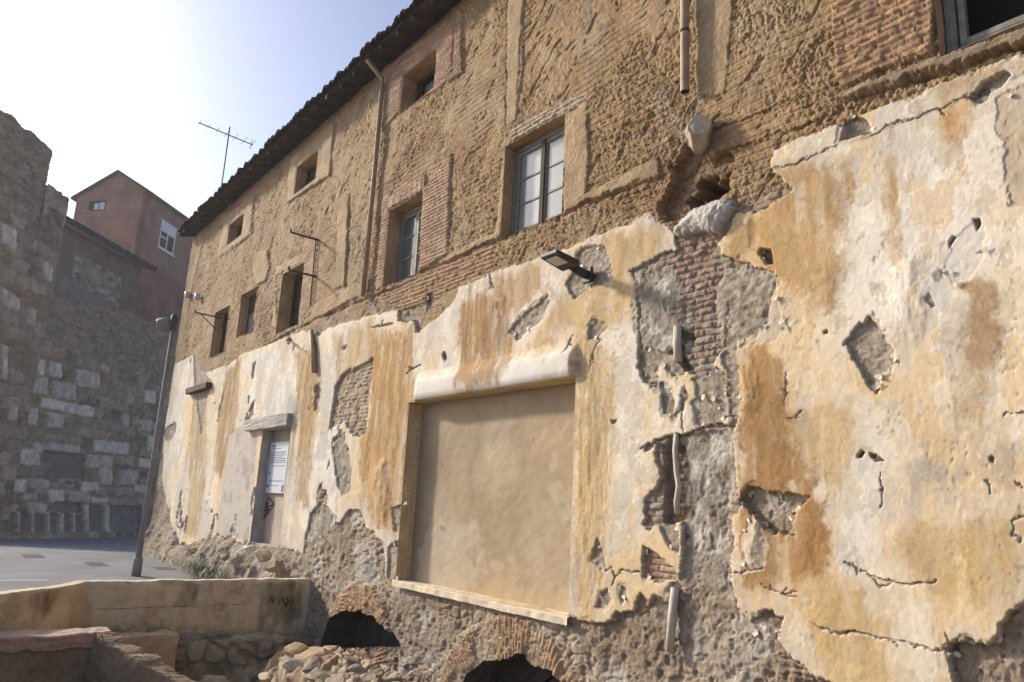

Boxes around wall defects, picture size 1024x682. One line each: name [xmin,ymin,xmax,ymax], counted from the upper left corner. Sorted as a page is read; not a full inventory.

crack [870,90,986,136]
crack [771,145,838,170]
spalling [846,317,898,393]
leakage [961,281,999,367]
leakage [187,361,240,536]
spalling [329,357,374,494]
leakage [334,326,414,530]
flaking render [597,197,809,659]
spalling [307,503,337,541]
spalling [387,500,407,580]
crack [844,560,938,588]
crack [812,622,960,655]